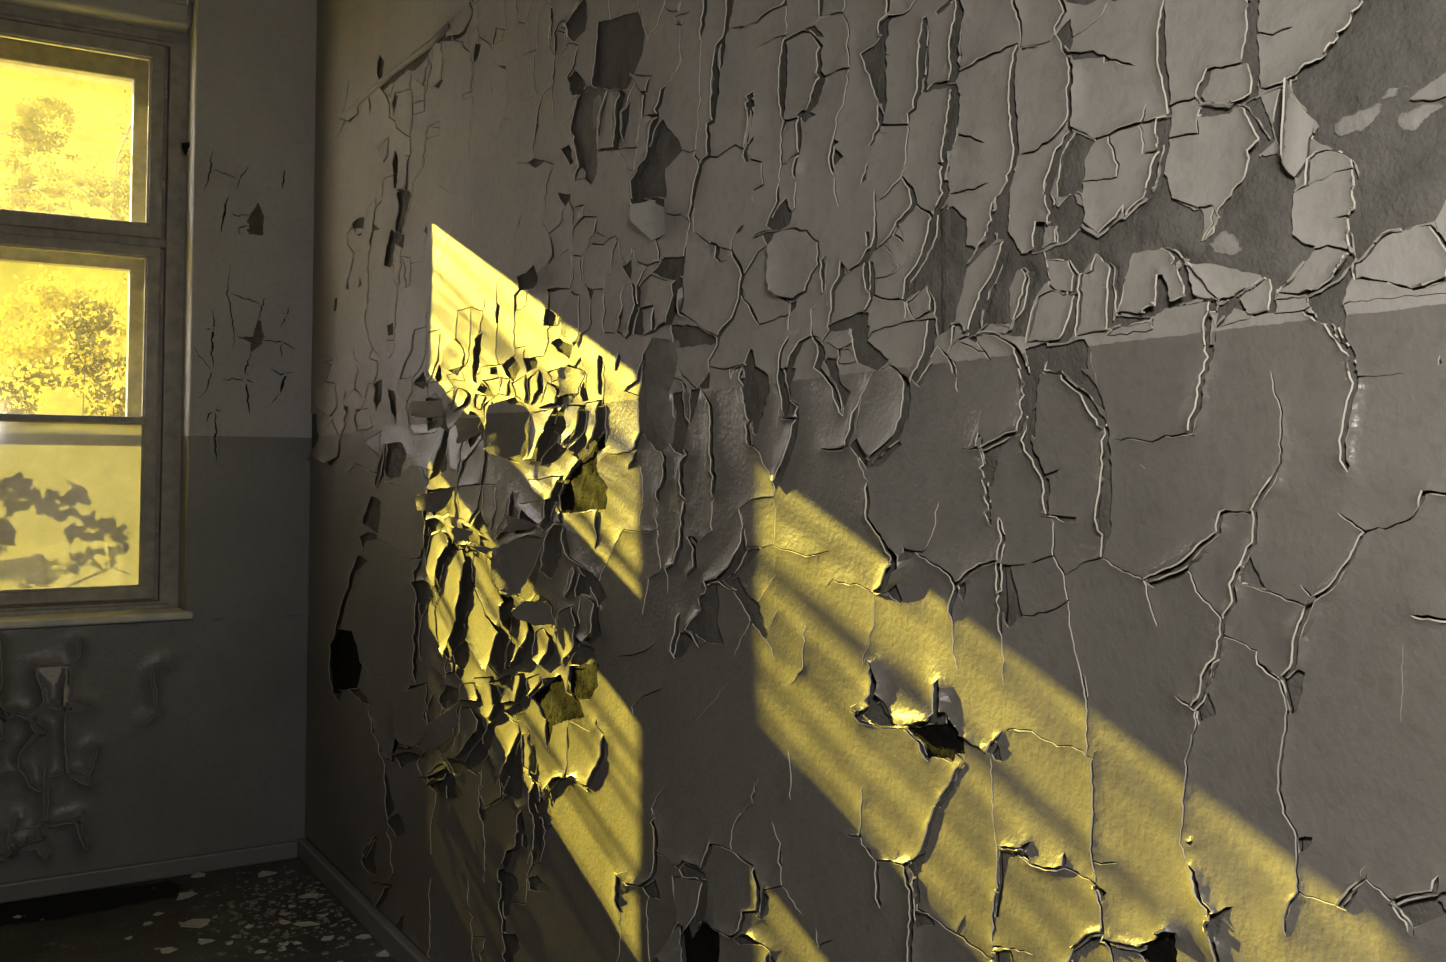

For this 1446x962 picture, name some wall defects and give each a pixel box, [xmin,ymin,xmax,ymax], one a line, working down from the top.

peeling [377,2,472,191]
crack [191,149,297,463]
peeling [515,0,1446,575]
peeling [309,382,400,488]
flaking render [331,630,362,694]
peeling [370,327,608,903]
peeling [722,497,776,602]
crack [1003,564,1011,625]
crack [1282,676,1294,714]
peeling [862,699,998,957]
crack [996,847,1004,962]
flaking render [1124,935,1178,962]